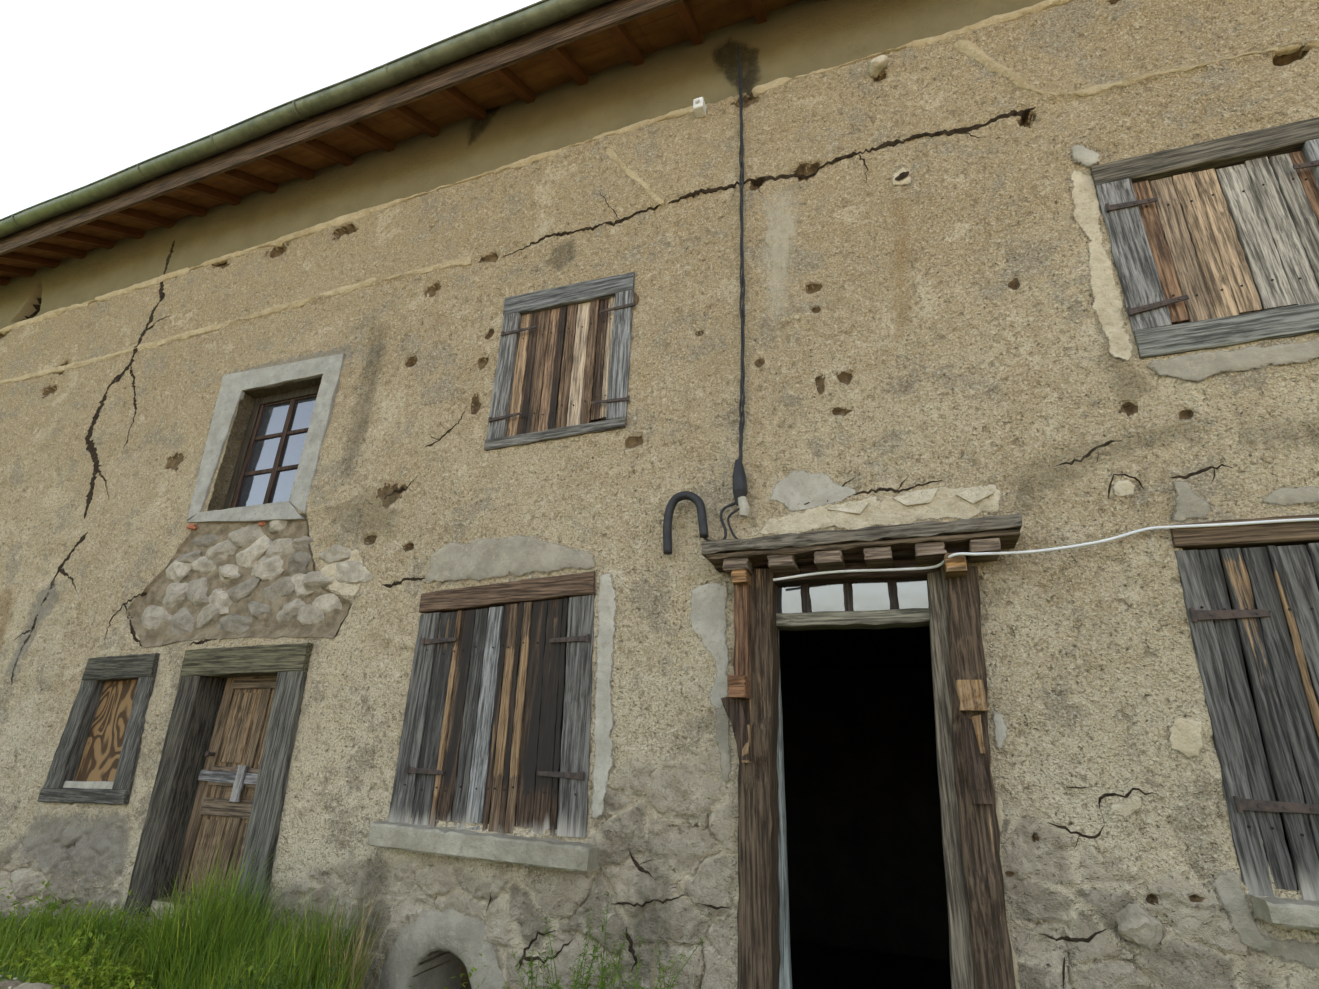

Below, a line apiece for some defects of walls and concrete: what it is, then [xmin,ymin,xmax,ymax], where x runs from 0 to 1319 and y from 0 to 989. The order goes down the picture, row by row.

crack [503,107,1036,257]
crack [11,240,175,685]
crack [189,638,216,646]
spalling [126,513,377,648]